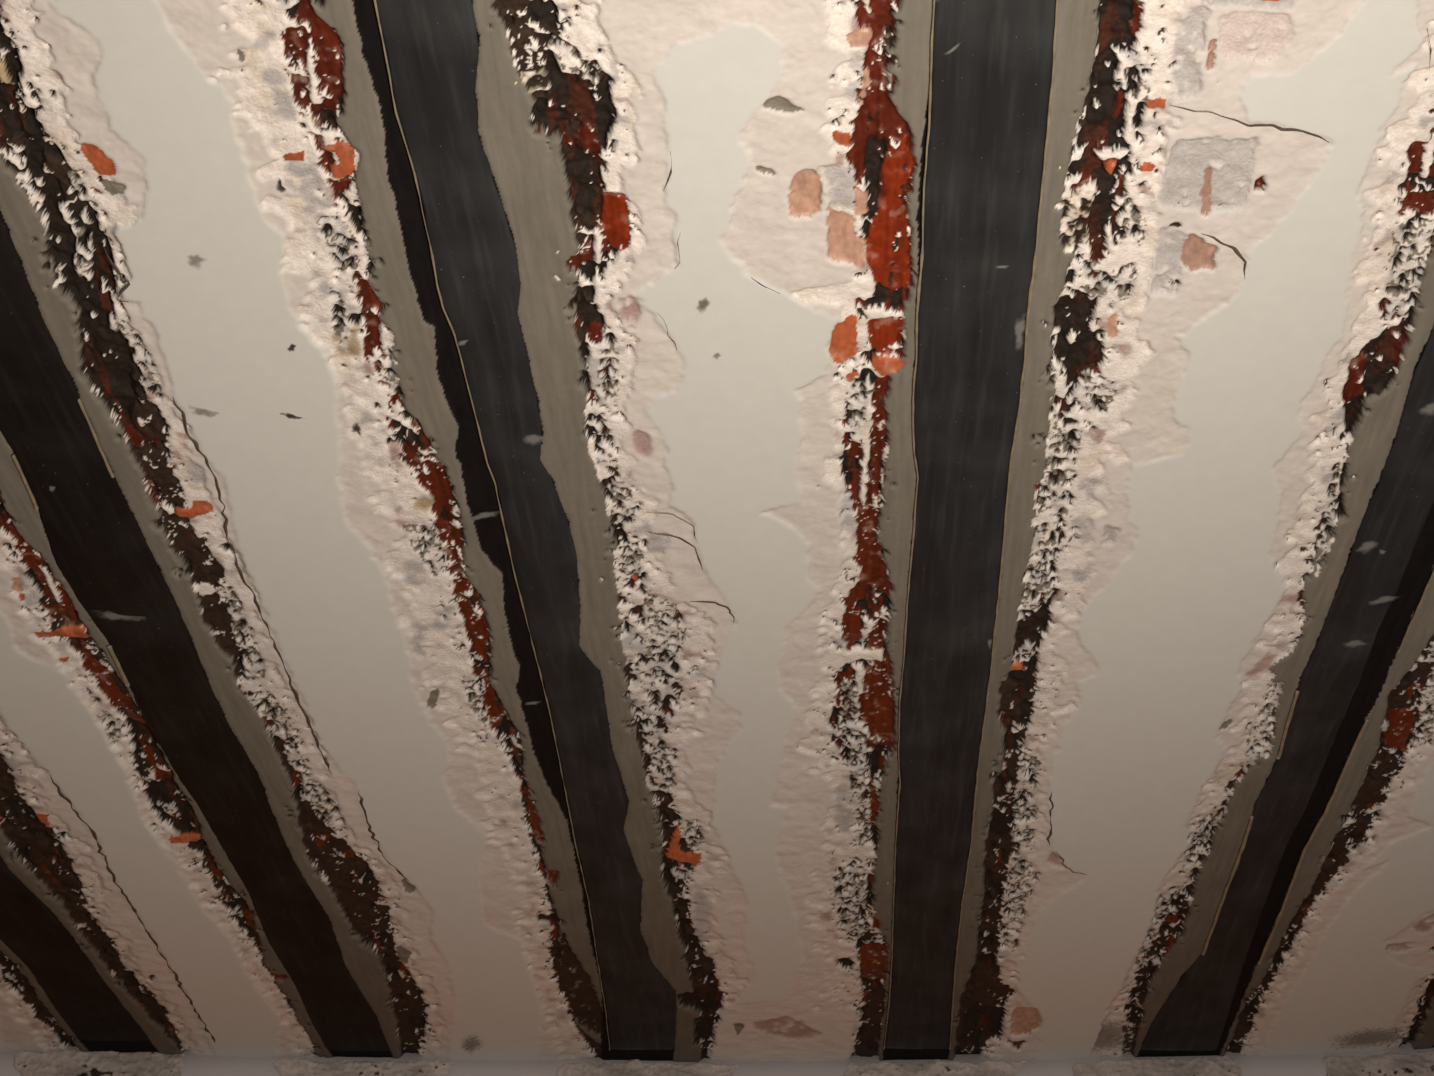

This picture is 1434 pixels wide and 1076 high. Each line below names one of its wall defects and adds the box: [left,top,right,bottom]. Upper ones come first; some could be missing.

spalling [0,0,456,1060]
flaking render [156,0,603,1061]
spalling [310,0,1334,1062]
crack [1170,105,1329,143]
spalling [1090,0,1434,1059]